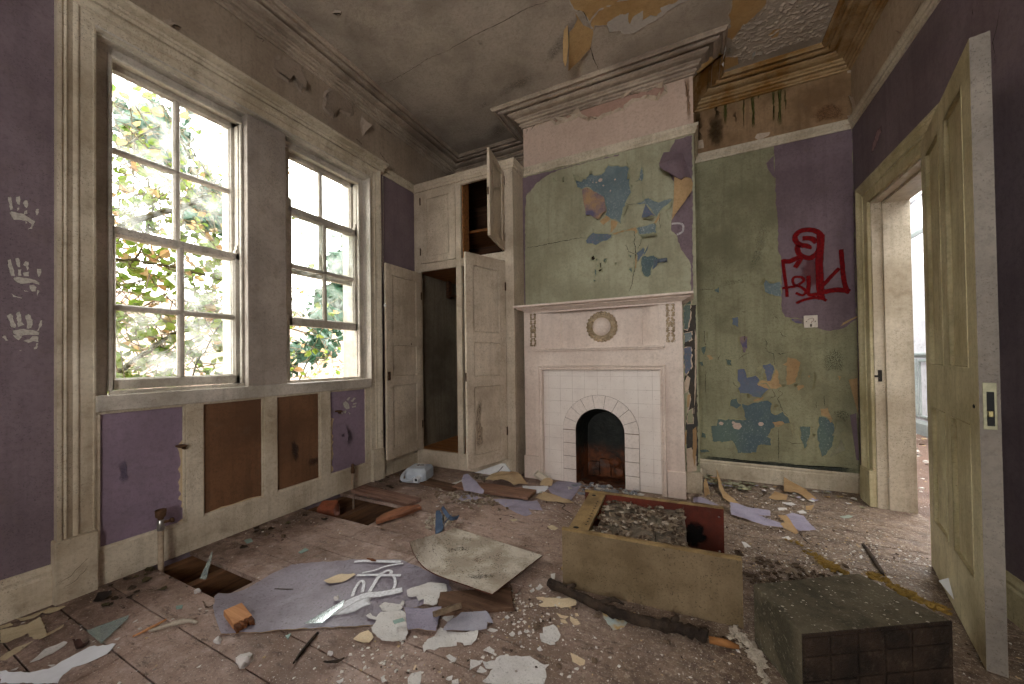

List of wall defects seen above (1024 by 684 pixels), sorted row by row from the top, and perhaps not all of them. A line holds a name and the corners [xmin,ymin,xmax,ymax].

peeling [551,81,668,125]
peeling [563,0,690,71]
water stain [696,96,759,143]
peeling [693,0,889,114]
peeling [573,158,673,282]
peeling [682,301,846,472]